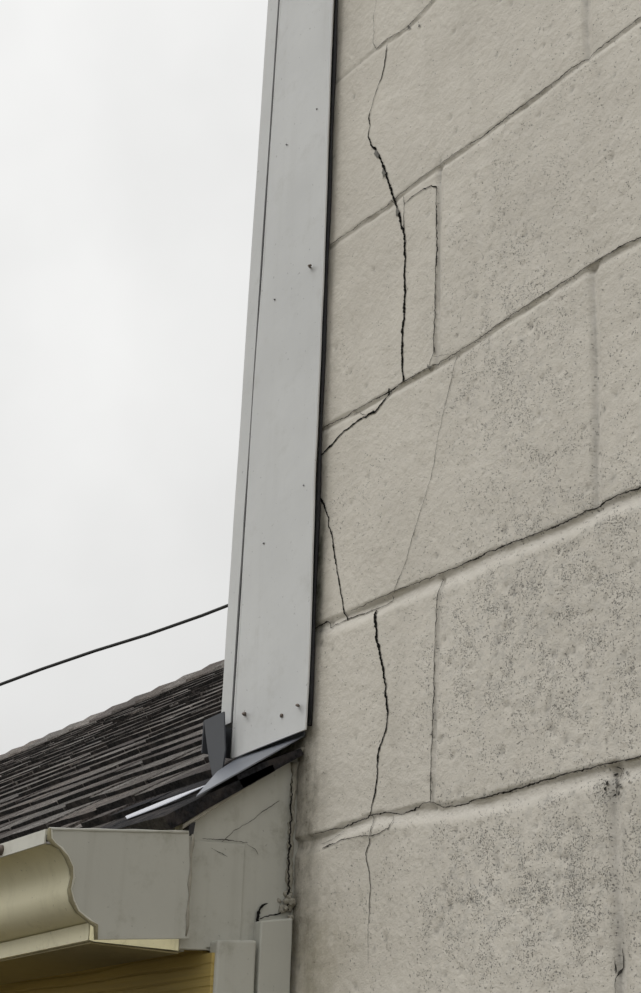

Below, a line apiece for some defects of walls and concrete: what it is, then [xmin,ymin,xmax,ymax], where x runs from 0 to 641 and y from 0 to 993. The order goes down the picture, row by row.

crack [203,781,293,922]
crack [315,0,641,923]